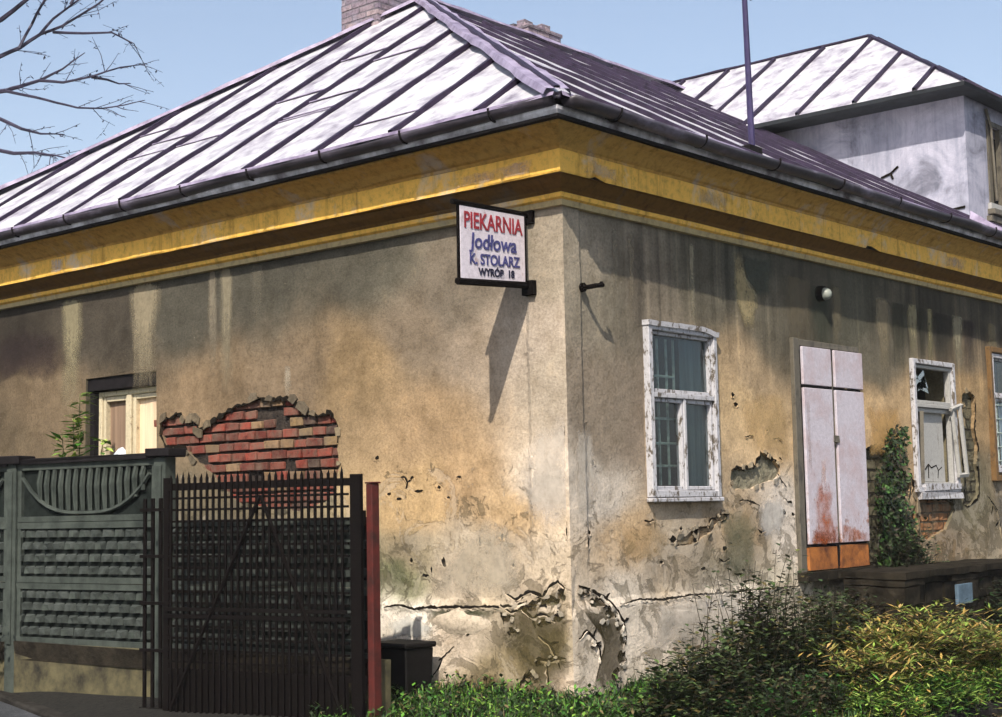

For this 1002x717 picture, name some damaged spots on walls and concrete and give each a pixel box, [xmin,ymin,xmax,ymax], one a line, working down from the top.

damp [3,299,79,377]
damp [133,283,157,369]
damp [209,268,231,353]
damp [877,298,972,361]
flaking render [154,393,341,515]
flaking render [730,450,780,490]
corrosion [816,466,835,543]
flaking render [866,387,980,567]
flaking render [500,588,566,636]
flaking render [526,655,558,683]
crack [383,558,801,698]
flaking render [577,587,627,685]